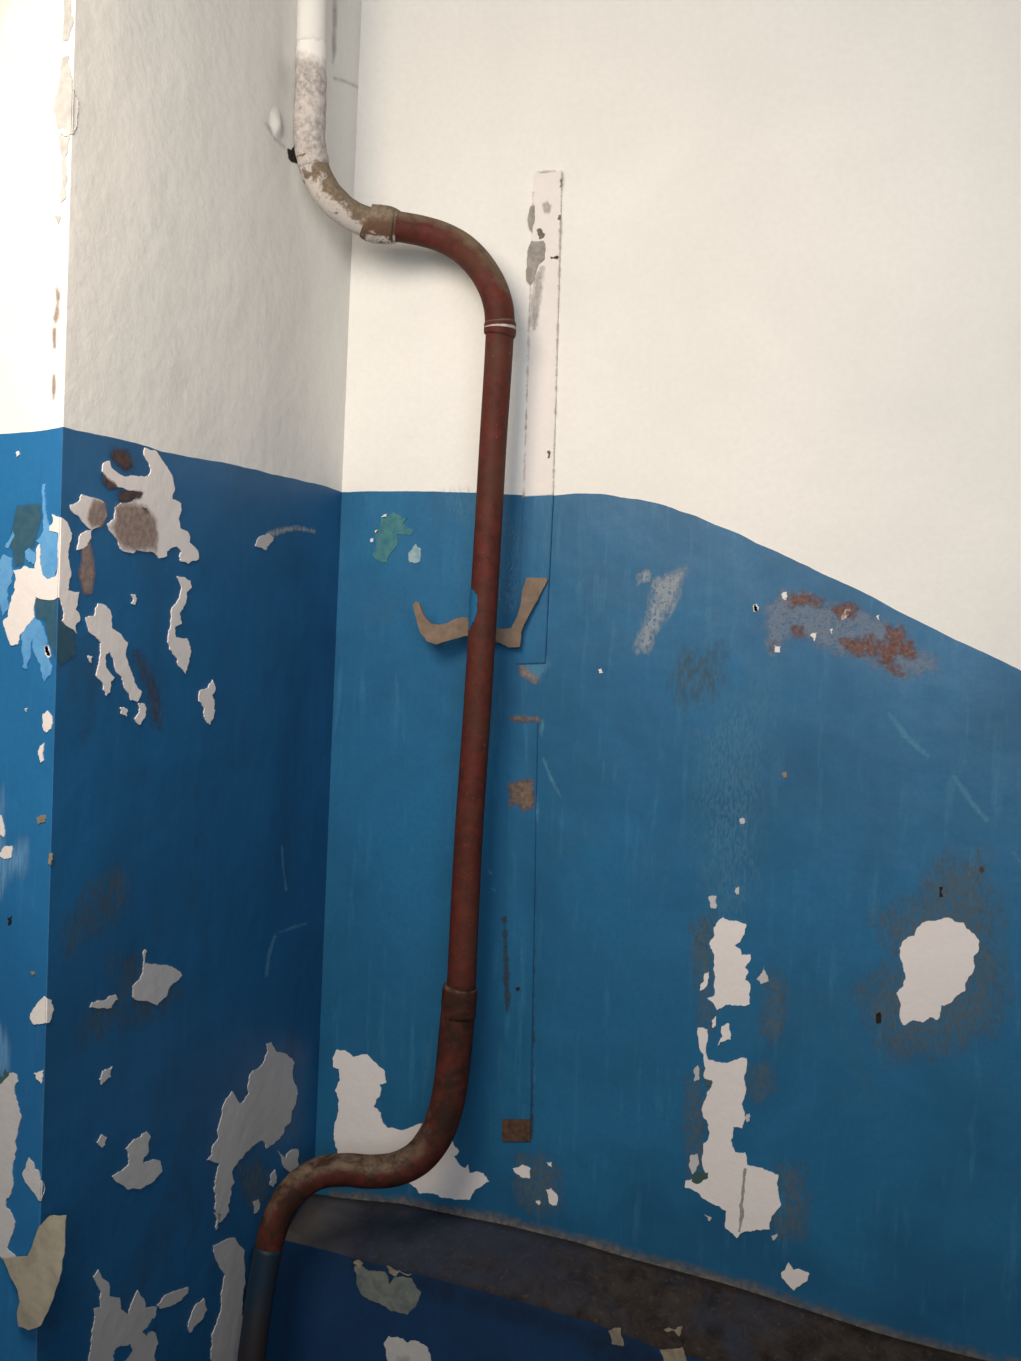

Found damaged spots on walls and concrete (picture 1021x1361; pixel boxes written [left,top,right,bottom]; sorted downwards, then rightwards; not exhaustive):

peeling [0,448,199,725]
rust [753,590,935,676]
peeling [25,708,53,763]
peeling [198,680,216,725]
peeling [30,996,54,1025]
peeling [90,949,182,1009]
peeling [860,861,995,1050]
peeling [333,1049,422,1154]
peeling [685,895,803,1241]
peeling [0,1068,67,1330]
peeling [88,1042,299,1361]
peeling [410,1141,489,1200]